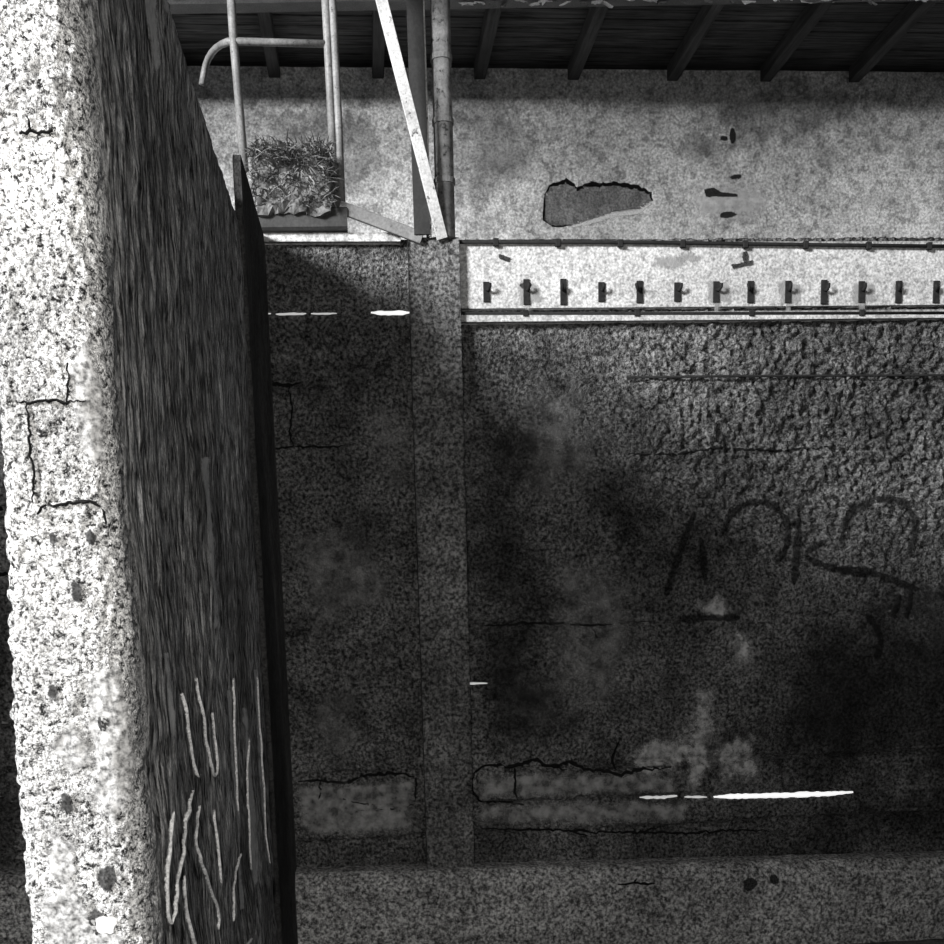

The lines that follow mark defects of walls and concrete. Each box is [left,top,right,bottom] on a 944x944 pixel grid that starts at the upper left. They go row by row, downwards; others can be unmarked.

spalling [543,178,653,227]
crack [472,741,672,805]
crack [481,827,770,836]